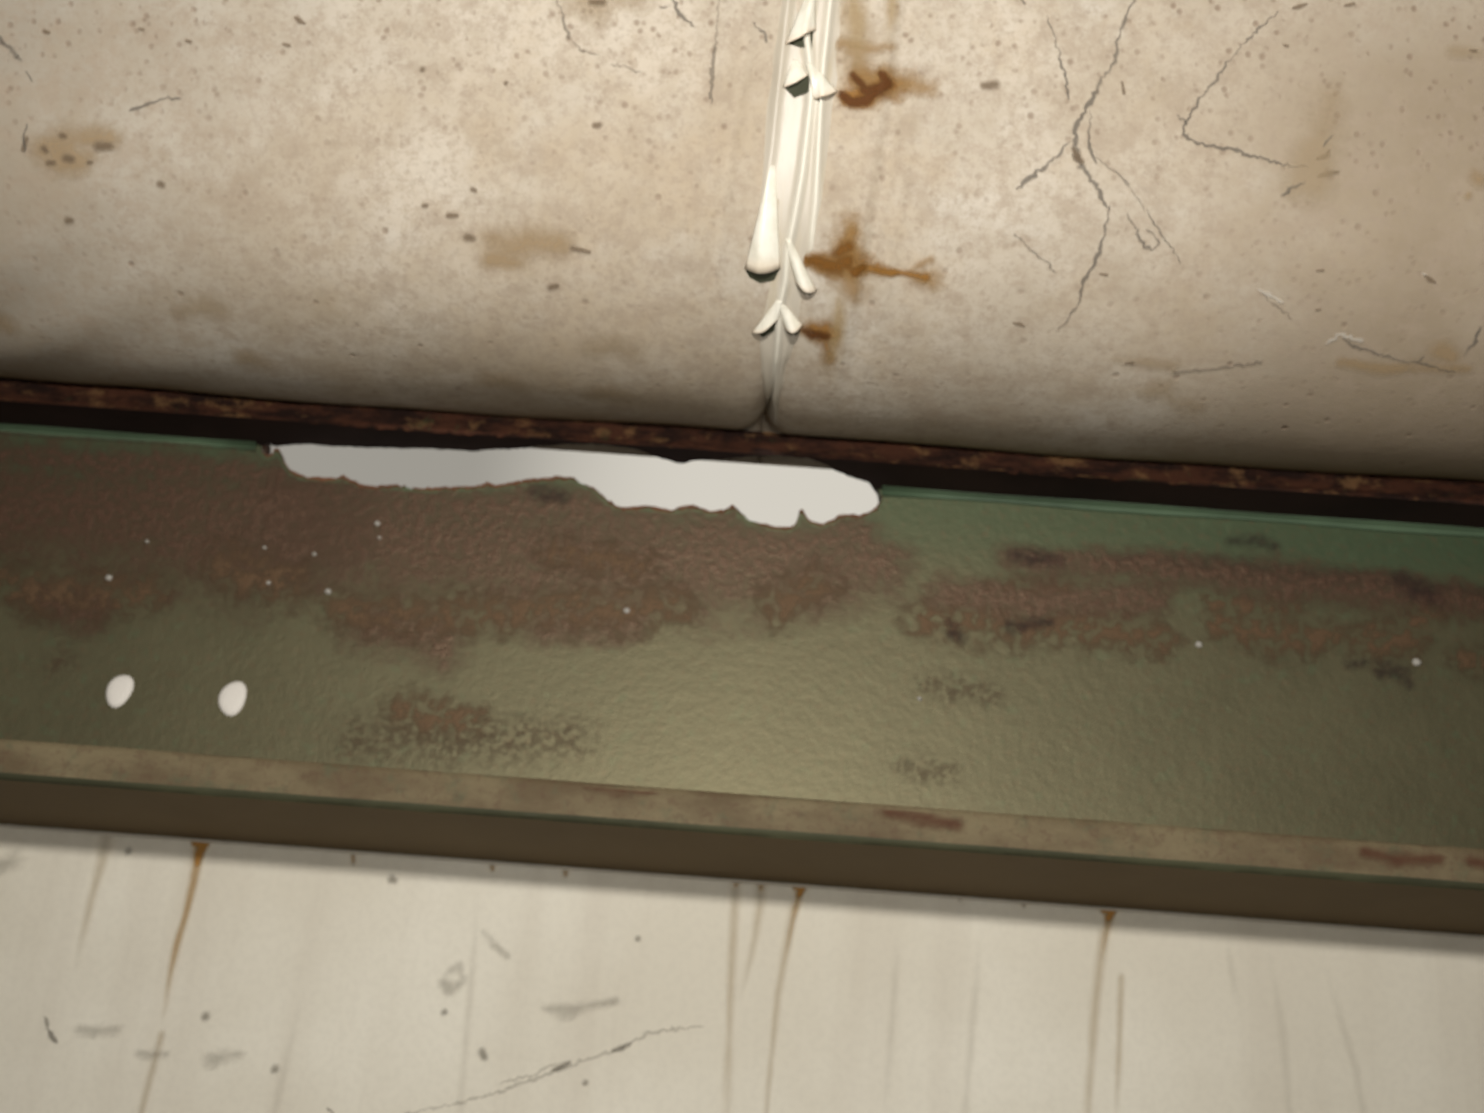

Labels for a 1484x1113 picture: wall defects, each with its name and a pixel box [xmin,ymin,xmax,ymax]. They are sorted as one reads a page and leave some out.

corrosion [837,40,930,108]
crack [1181,3,1339,195]
leakage [22,131,115,170]
crack [1017,0,1180,327]
corrosion [803,220,936,297]
corrosion [802,311,841,362]
corrosion [261,448,882,530]
corrosion [173,842,209,961]